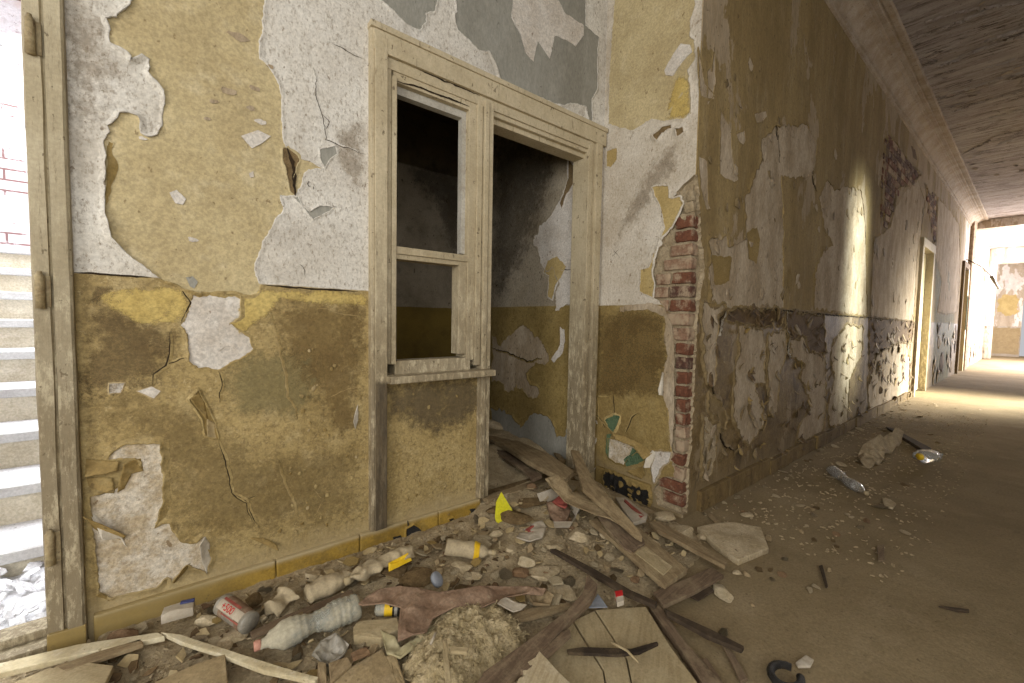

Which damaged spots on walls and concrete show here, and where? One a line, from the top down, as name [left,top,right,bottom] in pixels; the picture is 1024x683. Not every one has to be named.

flaking render [96,0,339,374]
peeling [452,0,960,507]
crack [152,291,192,387]
crack [218,371,226,403]
peeling [83,435,217,601]
crack [219,440,260,527]